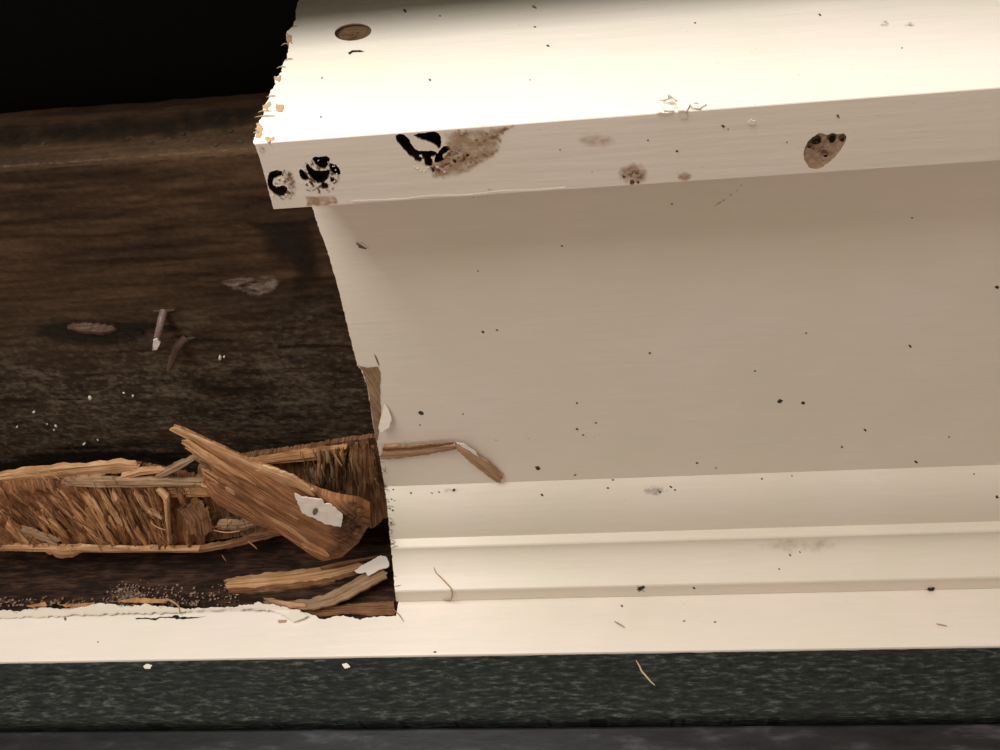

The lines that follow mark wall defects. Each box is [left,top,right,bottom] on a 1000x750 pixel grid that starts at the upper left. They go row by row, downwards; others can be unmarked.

spalling [803,133,846,168]
peeling [358,354,392,440]
peeling [294,493,343,527]
peeling [0,555,389,623]